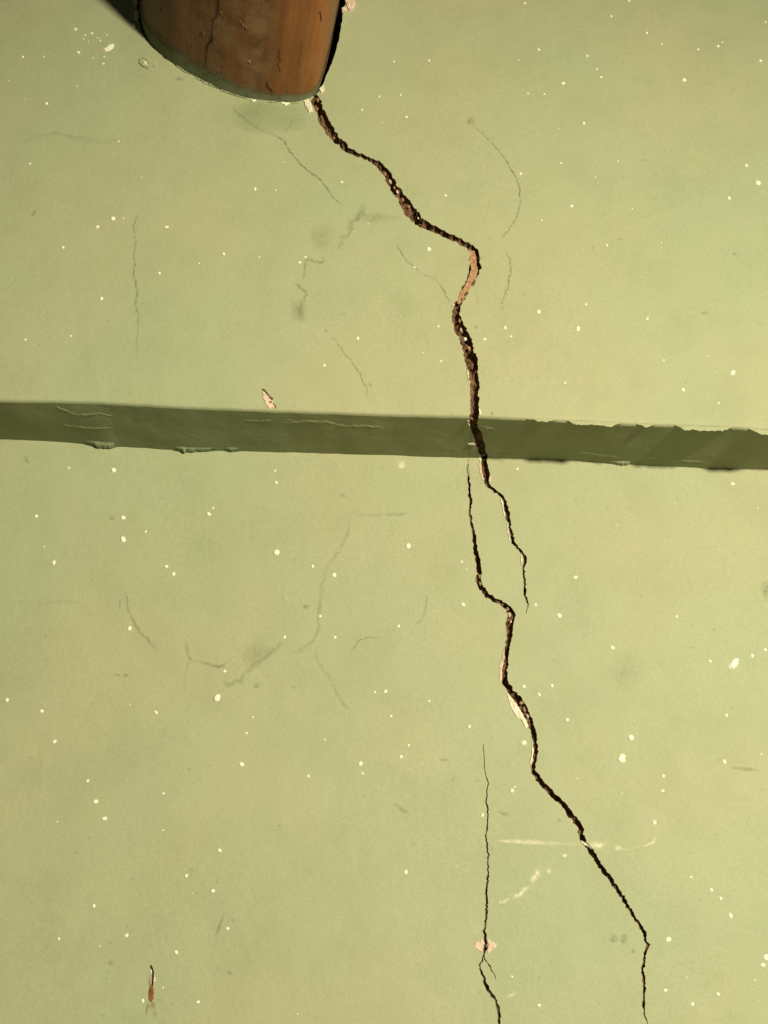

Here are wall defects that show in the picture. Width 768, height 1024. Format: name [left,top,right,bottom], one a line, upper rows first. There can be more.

spalling [261,388,277,409]
crack [311,95,650,1024]